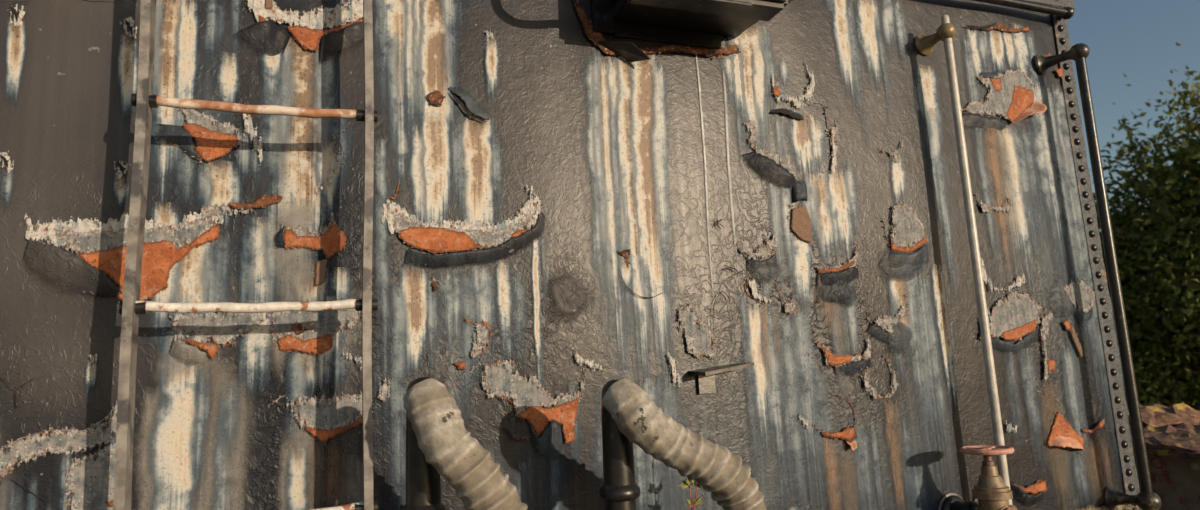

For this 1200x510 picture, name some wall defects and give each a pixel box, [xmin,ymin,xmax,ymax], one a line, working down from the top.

peeling [236,0,363,64]
damp [826,0,906,117]
damp [140,0,350,510]
damp [375,0,546,510]
peeling [381,176,545,291]
damp [889,64,957,435]
damp [965,26,1122,402]
peeling [0,400,117,510]
peeling [168,309,362,370]
peeling [454,315,602,455]
peeling [980,259,1105,451]
damp [1064,353,1088,496]